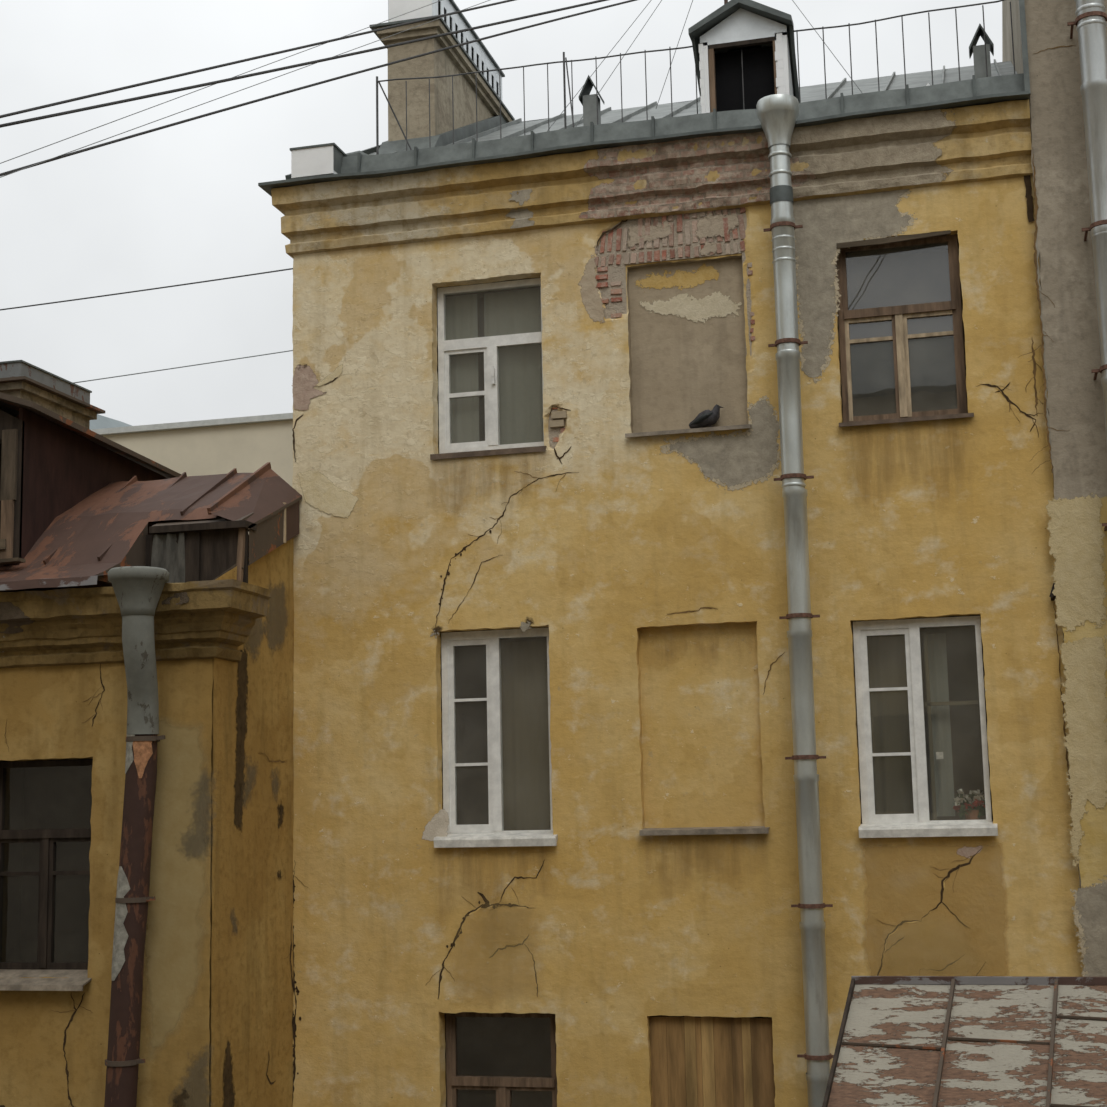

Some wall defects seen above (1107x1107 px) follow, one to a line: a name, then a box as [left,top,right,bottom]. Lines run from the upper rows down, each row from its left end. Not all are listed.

flaking render [292,364,343,410]
spalling [578,131,770,356]
flaking render [660,395,781,491]
flaking render [789,108,957,383]
crack [978,147,1070,473]
crack [434,471,579,633]
corrosion [132,741,153,778]
leakage [234,585,287,832]
peeling [1046,493,1107,866]
crack [425,859,545,999]
crack [877,848,982,976]
leakage [223,1041,236,1107]